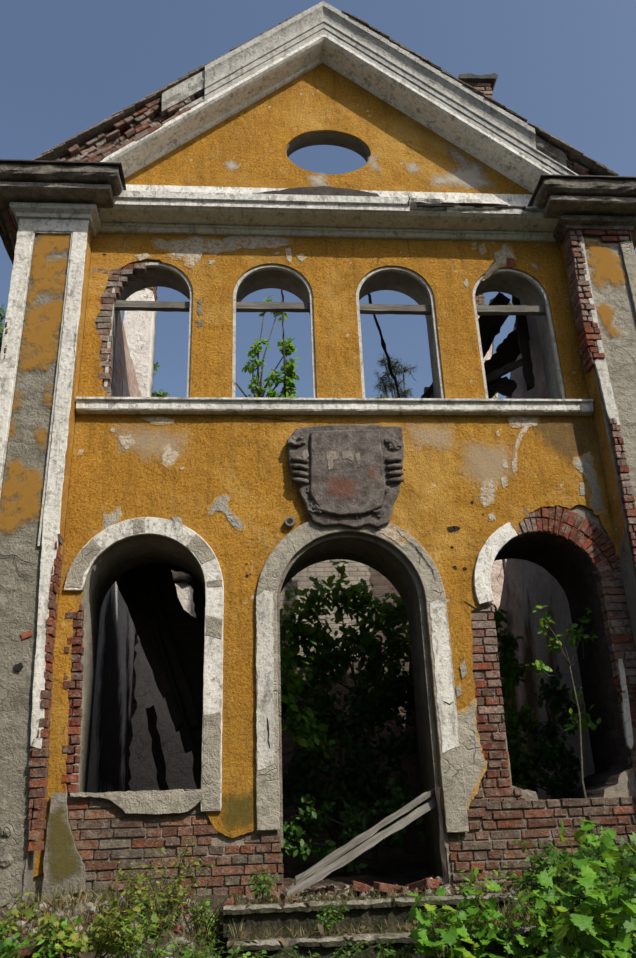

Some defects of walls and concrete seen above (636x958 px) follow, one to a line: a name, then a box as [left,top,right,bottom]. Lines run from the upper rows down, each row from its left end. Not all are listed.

peeling [432,148,489,188]
peeling [92,235,308,397]
flaking render [563,230,633,374]
peeling [160,442,184,470]
peeling [207,493,246,532]
peeling [380,523,411,547]
peeling [471,415,539,521]
flaking render [608,418,636,576]
flaking render [507,451,636,779]
flaking render [28,506,285,897]
flaking render [430,600,636,888]
damp [49,809,77,880]